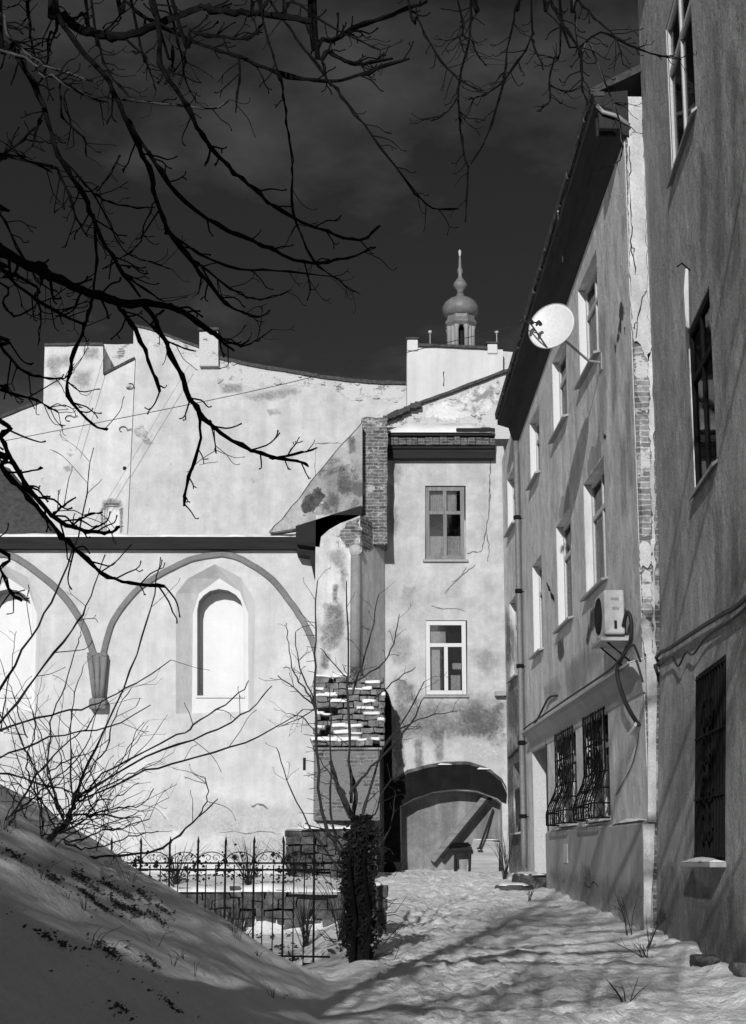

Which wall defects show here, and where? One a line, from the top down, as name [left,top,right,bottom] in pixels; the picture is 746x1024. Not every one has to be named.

crack [629,146,650,338]
peeling [217,360,502,423]
flaking render [633,343,651,537]
flaking render [335,515,383,553]
crack [432,461,491,612]
water stain [323,586,342,645]
flaking render [639,569,653,616]